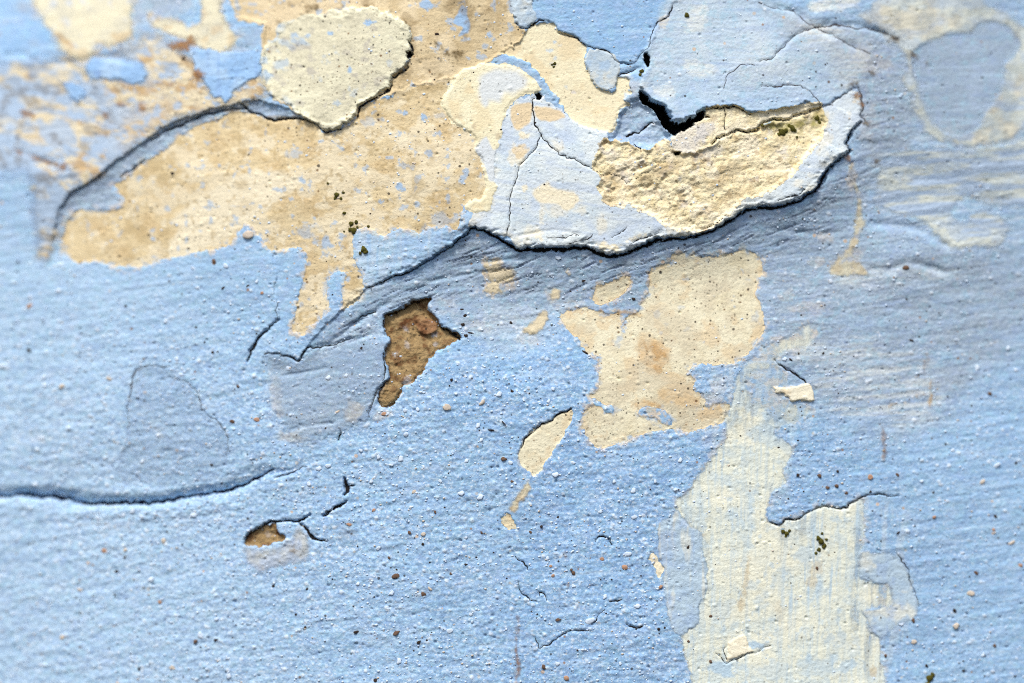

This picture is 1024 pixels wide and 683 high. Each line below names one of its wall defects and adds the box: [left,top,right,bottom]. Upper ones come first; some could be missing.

crack [62,42,414,208]
peeling [0,0,705,336]
crack [247,2,897,414]
spalling [378,298,461,407]
crack [0,466,307,506]
spalling [244,523,308,571]
peeling [501,249,918,683]
crack [770,493,899,525]